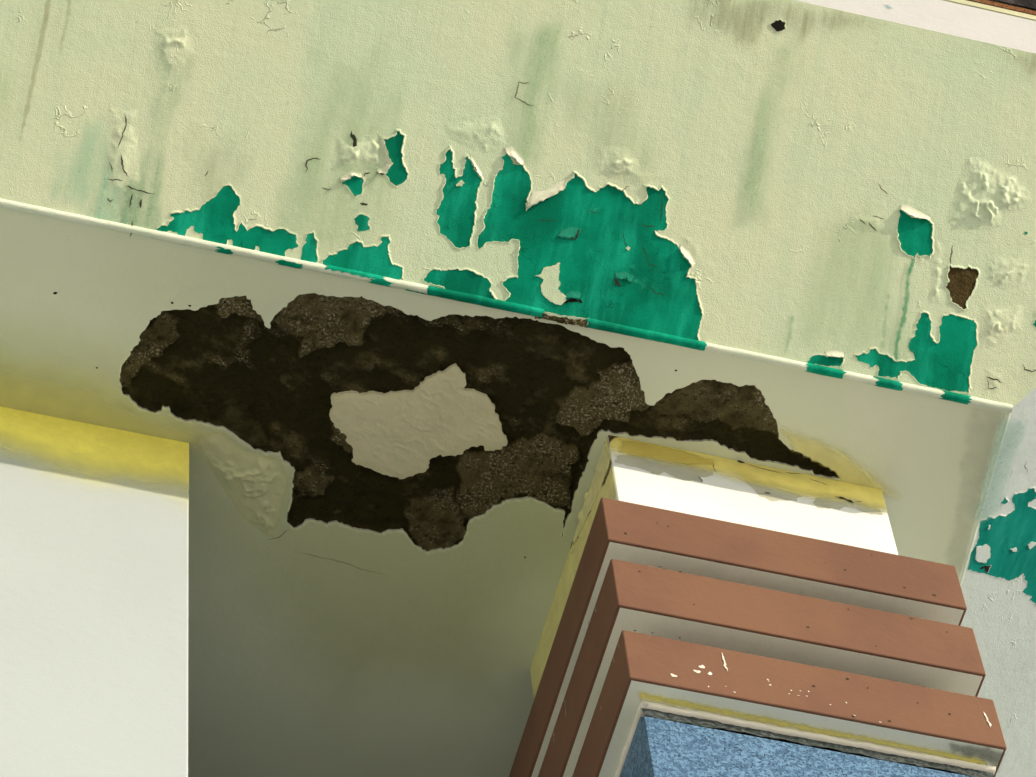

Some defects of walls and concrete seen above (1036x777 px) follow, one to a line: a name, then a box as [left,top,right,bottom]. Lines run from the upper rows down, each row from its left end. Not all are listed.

peeling [376,128,410,189]
peeling [894,205,935,261]
flaking render [119,145,840,552]
peeling [805,263,981,404]
damp [530,437,887,699]
peeling [738,476,884,517]
peeling [966,486,1036,607]